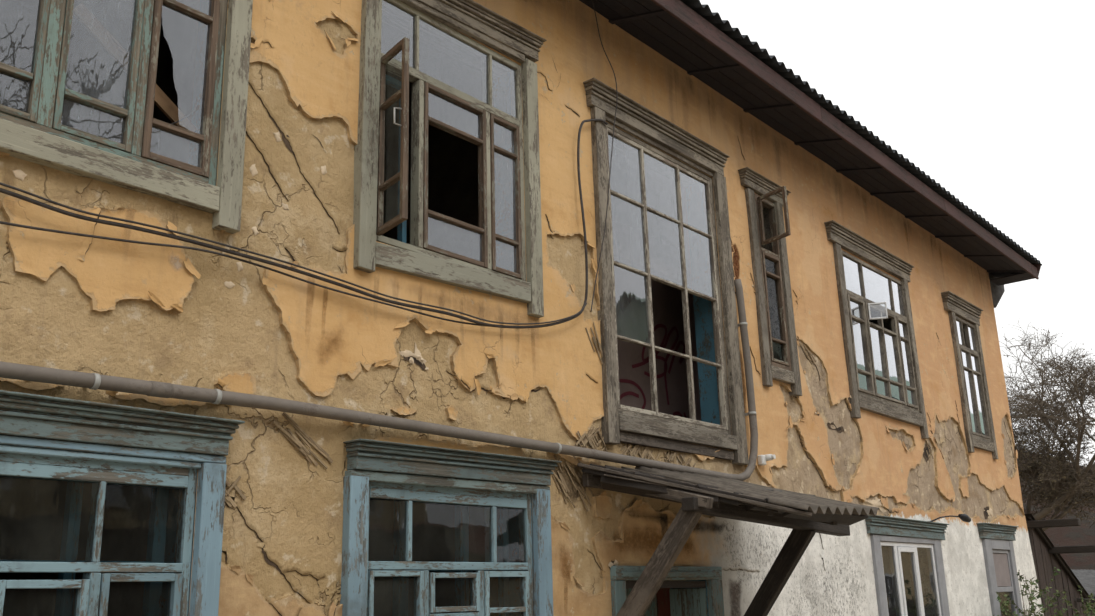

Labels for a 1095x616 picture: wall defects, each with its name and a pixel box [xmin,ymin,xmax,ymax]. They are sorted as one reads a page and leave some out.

peeling [316,11,358,55]
crack [246,78,348,273]
peeling [0,61,1024,523]
crack [222,546,232,563]
peeling [0,378,510,616]
crack [224,473,341,616]
peeling [522,448,682,595]